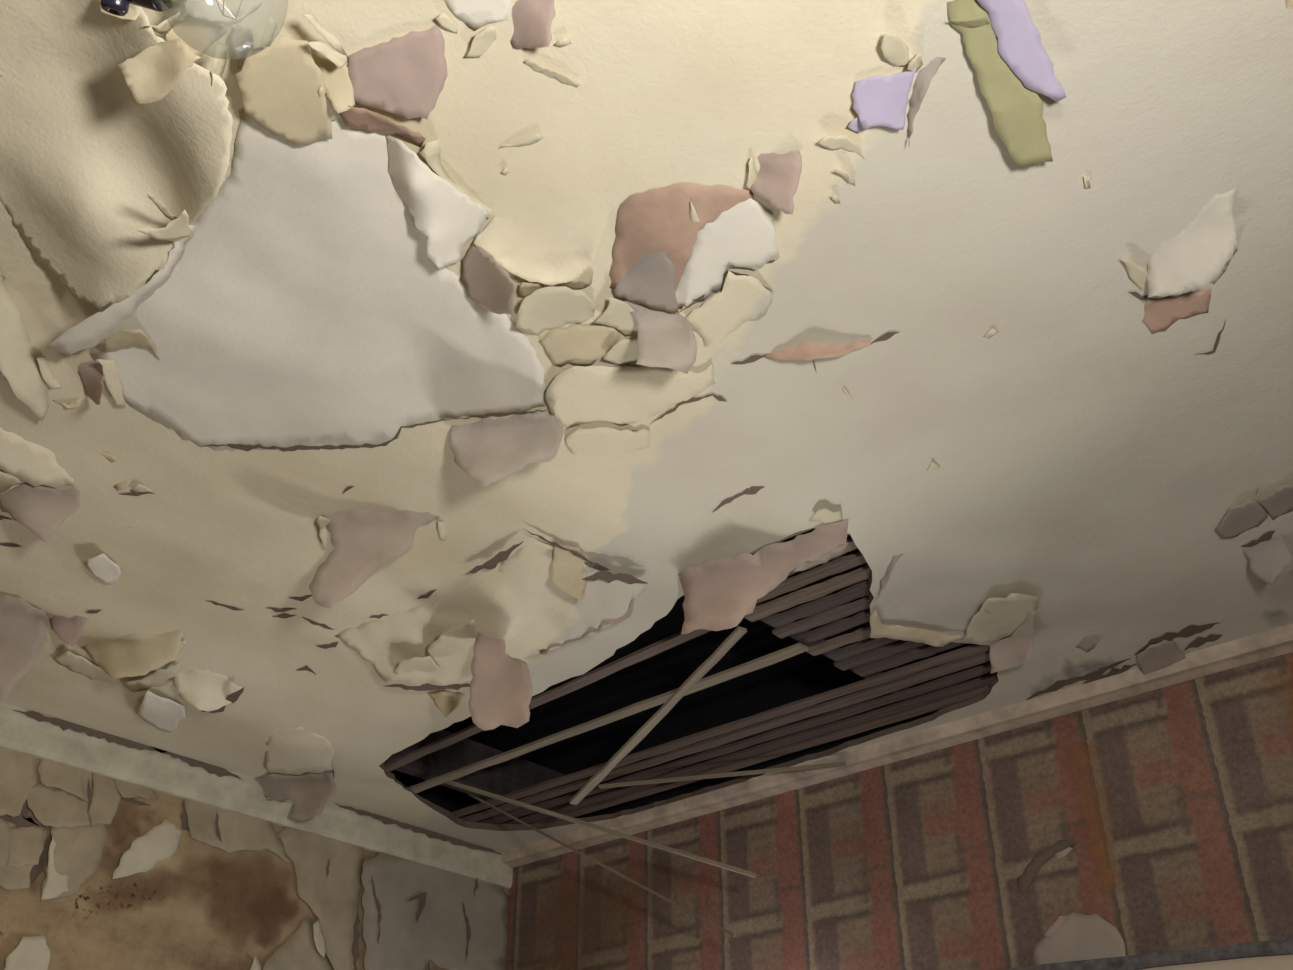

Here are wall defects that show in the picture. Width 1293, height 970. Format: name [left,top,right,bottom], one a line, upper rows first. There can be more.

peeling [818,32,946,159]
peeling [947,0,1066,167]
flaking render [0,0,802,488]
peeling [1121,188,1238,334]
peeling [0,427,80,543]
peeling [87,553,121,585]
peeling [0,593,245,733]
peeling [335,529,648,731]
peeling [678,508,848,634]
peeling [870,553,1039,674]
peeling [1216,485,1293,584]
peeling [0,727,509,970]